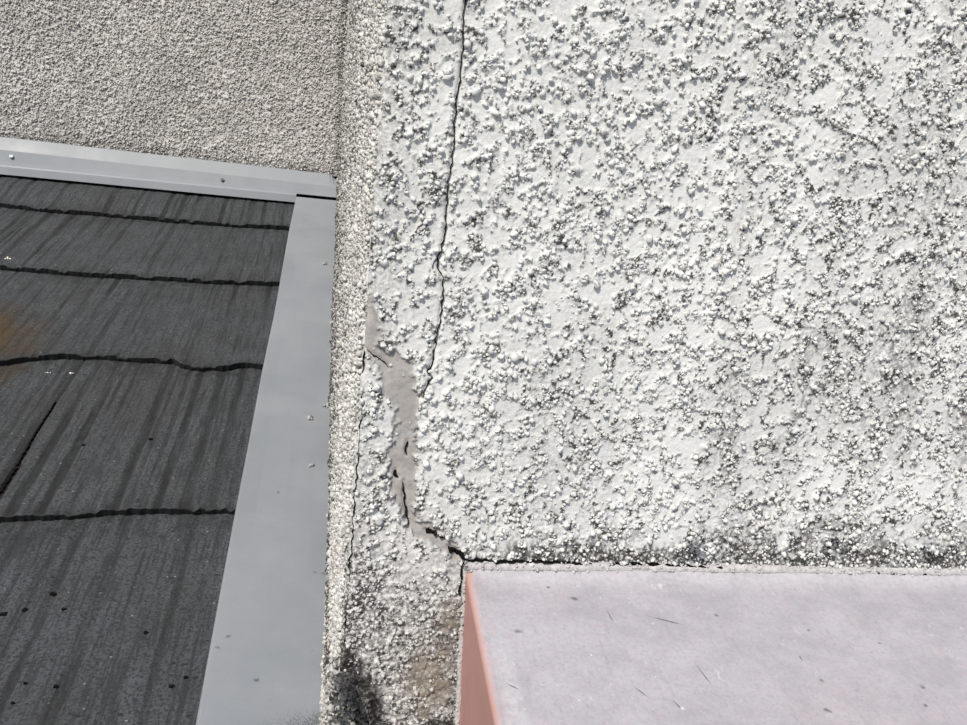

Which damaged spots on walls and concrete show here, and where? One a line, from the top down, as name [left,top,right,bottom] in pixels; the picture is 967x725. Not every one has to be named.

crack [423,1,466,397]
crack [343,349,389,645]
spalling [364,293,465,561]
leakage [325,617,385,725]
leakage [410,590,465,725]